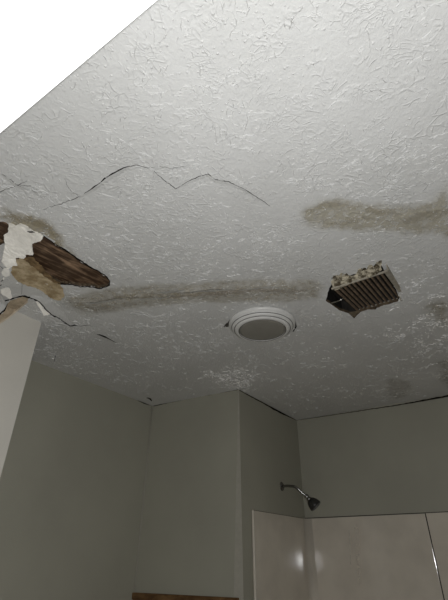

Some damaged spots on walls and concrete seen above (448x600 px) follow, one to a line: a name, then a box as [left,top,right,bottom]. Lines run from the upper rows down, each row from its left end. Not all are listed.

crack [43,165,268,210]
water stain [306,198,448,234]
peeling [0,222,110,313]
spalling [331,260,382,290]
crack [5,295,96,327]